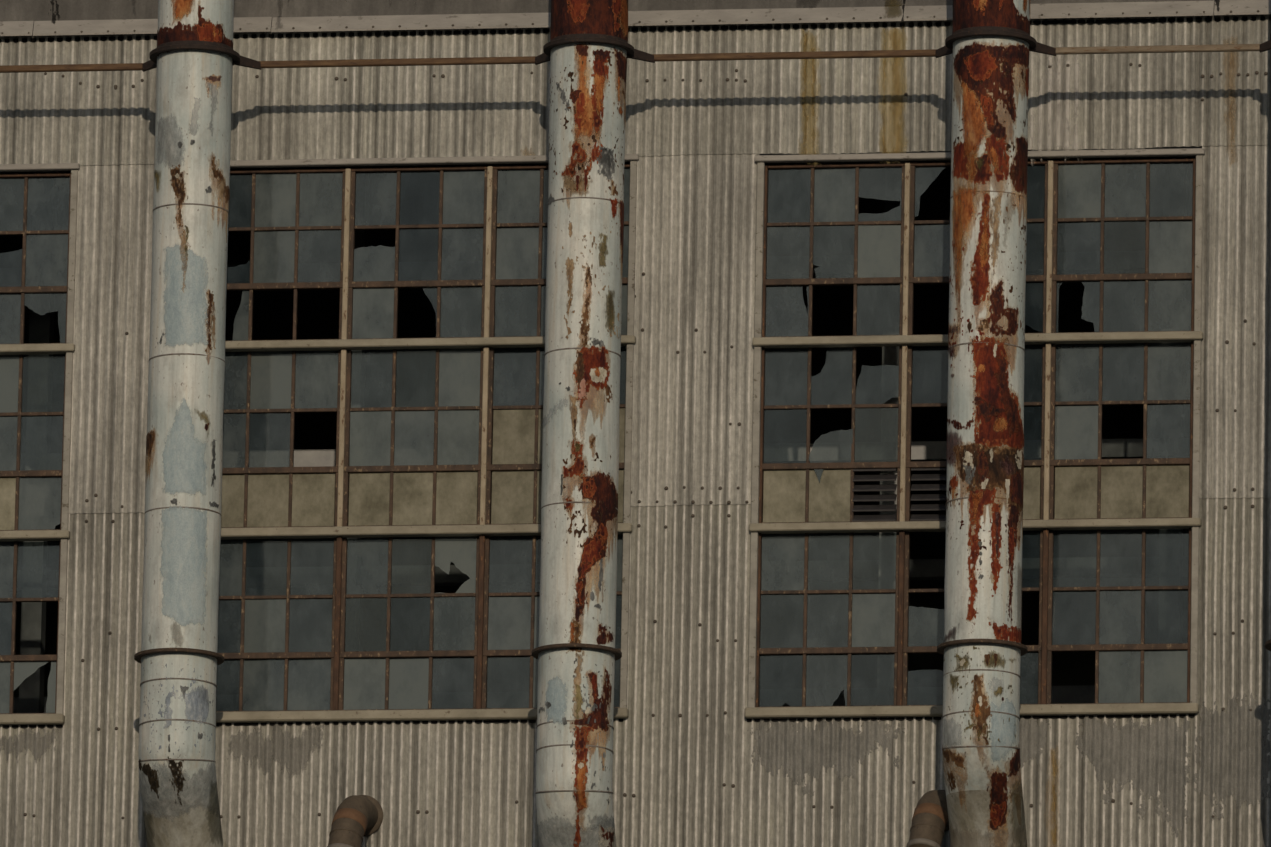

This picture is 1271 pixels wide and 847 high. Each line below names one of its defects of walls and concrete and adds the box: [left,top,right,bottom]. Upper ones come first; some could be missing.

corrosion [157,0,233,56]
corrosion [550,0,628,204]
corrosion [610,180,624,275]
corrosion [948,0,1030,454]
corrosion [139,757,188,805]
corrosion [942,747,966,804]
corrosion [987,749,1022,847]